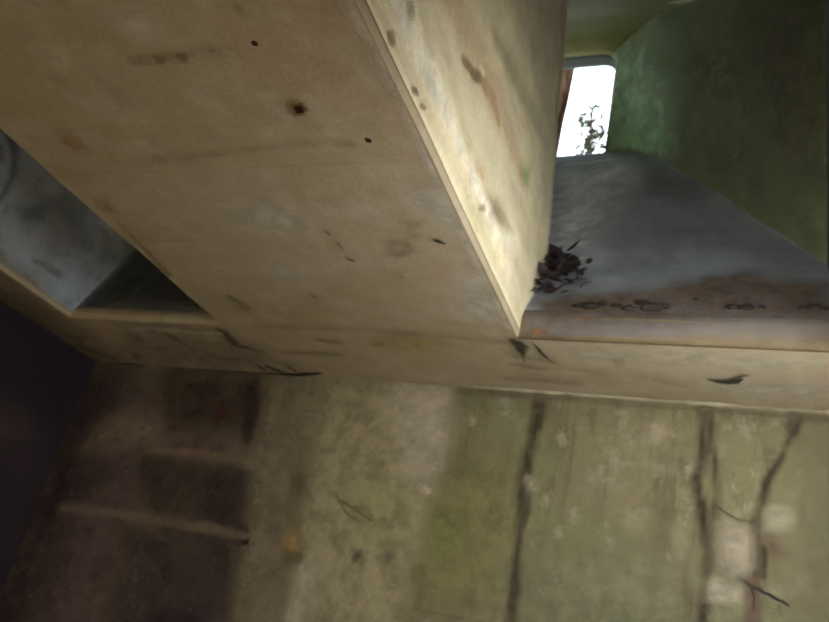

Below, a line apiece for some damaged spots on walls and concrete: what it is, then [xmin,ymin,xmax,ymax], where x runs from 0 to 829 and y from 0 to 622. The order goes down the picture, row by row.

crack [717,506,752,524]
crack [716,563,789,610]